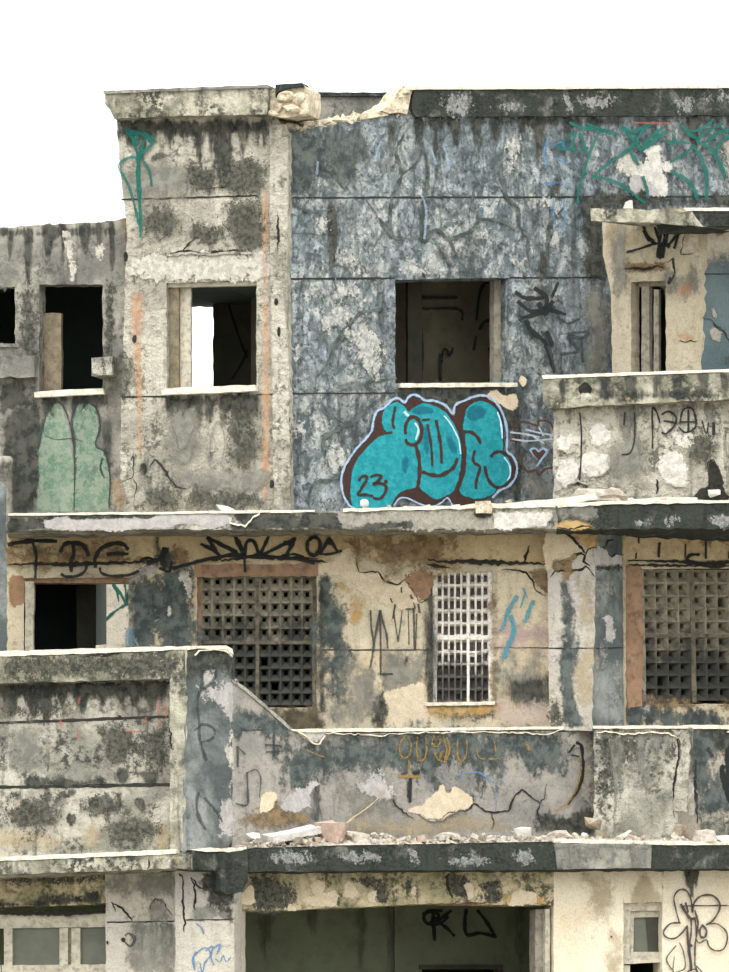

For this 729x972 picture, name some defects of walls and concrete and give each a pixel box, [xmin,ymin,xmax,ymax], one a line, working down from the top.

leakage [117,118,275,256]
spalling [268,85,348,131]
leakage [414,90,623,179]
peeling [616,145,673,198]
leakage [0,221,139,400]
leakage [580,189,729,485]
peeling [709,308,723,342]
crack [356,525,729,603]
leakage [0,379,461,849]
peeling [296,681,695,816]
peeling [408,784,473,822]
crack [391,785,547,828]